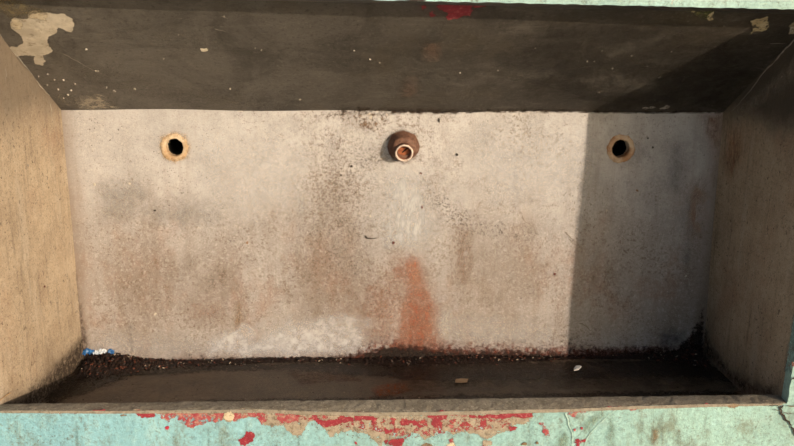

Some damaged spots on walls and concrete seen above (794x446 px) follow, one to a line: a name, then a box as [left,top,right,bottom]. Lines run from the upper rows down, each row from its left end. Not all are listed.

flaking render [0,0,75,66]
peeling [410,0,485,20]
flaking render [750,16,769,34]
leakage [193,316,773,395]
peeling [120,409,549,446]
peeling [565,406,619,446]
crack [770,405,794,433]